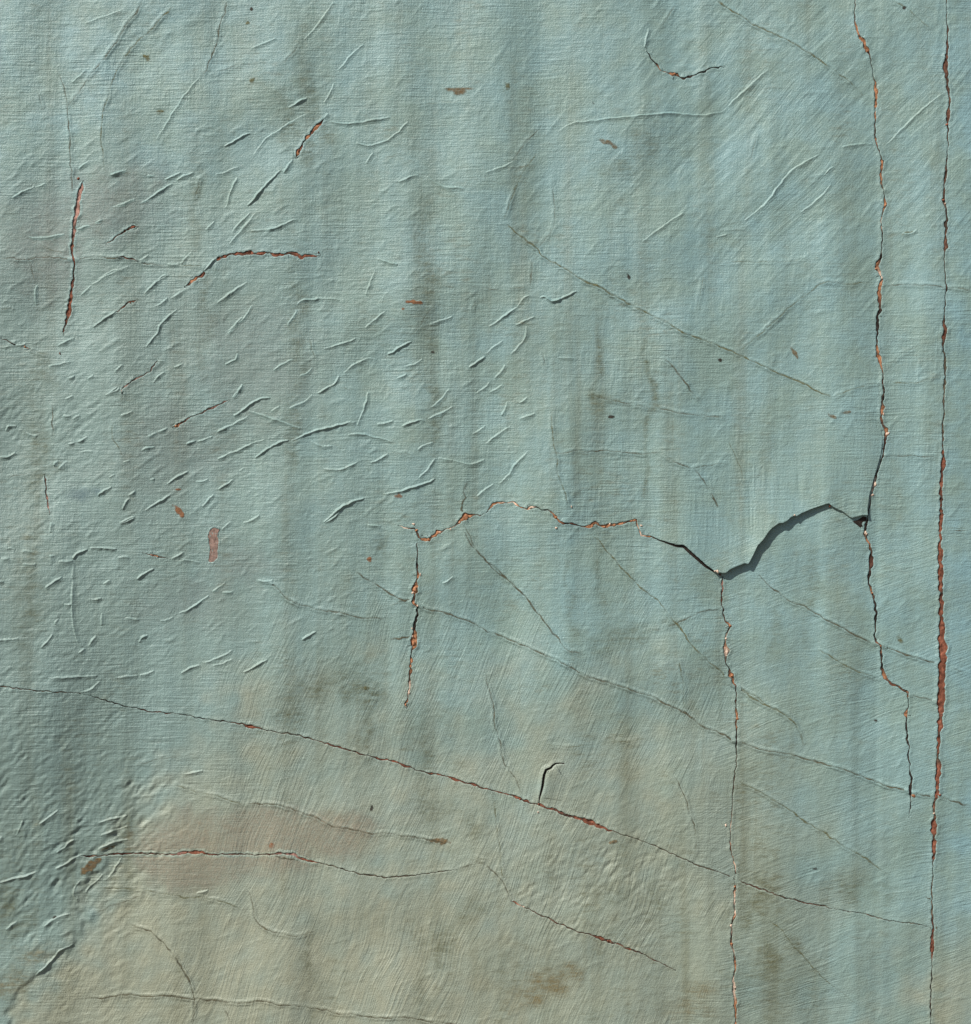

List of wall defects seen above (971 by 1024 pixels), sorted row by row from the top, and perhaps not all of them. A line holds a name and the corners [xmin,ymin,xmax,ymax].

crack [645,48,725,83]
crack [293,112,328,158]
crack [9,10,169,355]
crack [184,246,321,288]
crack [120,358,159,393]
crack [172,398,230,430]
crack [815,0,917,817]
crack [40,474,53,515]
crack [926,0,955,1024]
peeling [207,525,221,565]
crack [360,493,662,709]
crack [0,576,927,1024]